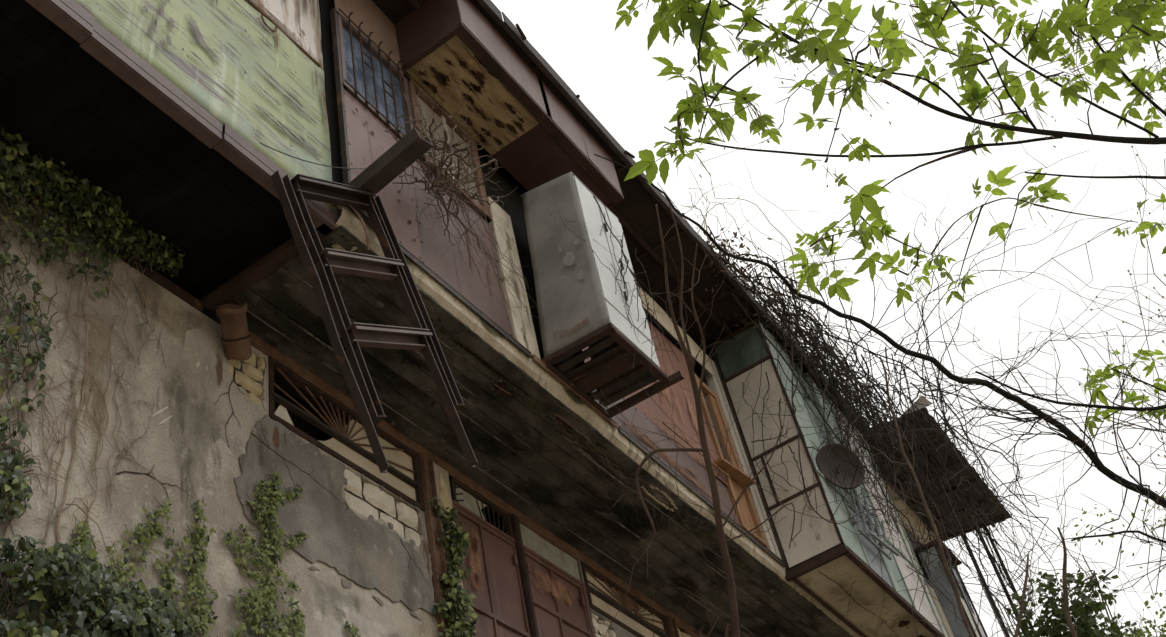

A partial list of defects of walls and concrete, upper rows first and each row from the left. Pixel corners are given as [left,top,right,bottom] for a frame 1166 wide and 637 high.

water stain [304,322,431,398]
crack [215,380,346,509]
flaking render [218,336,436,621]